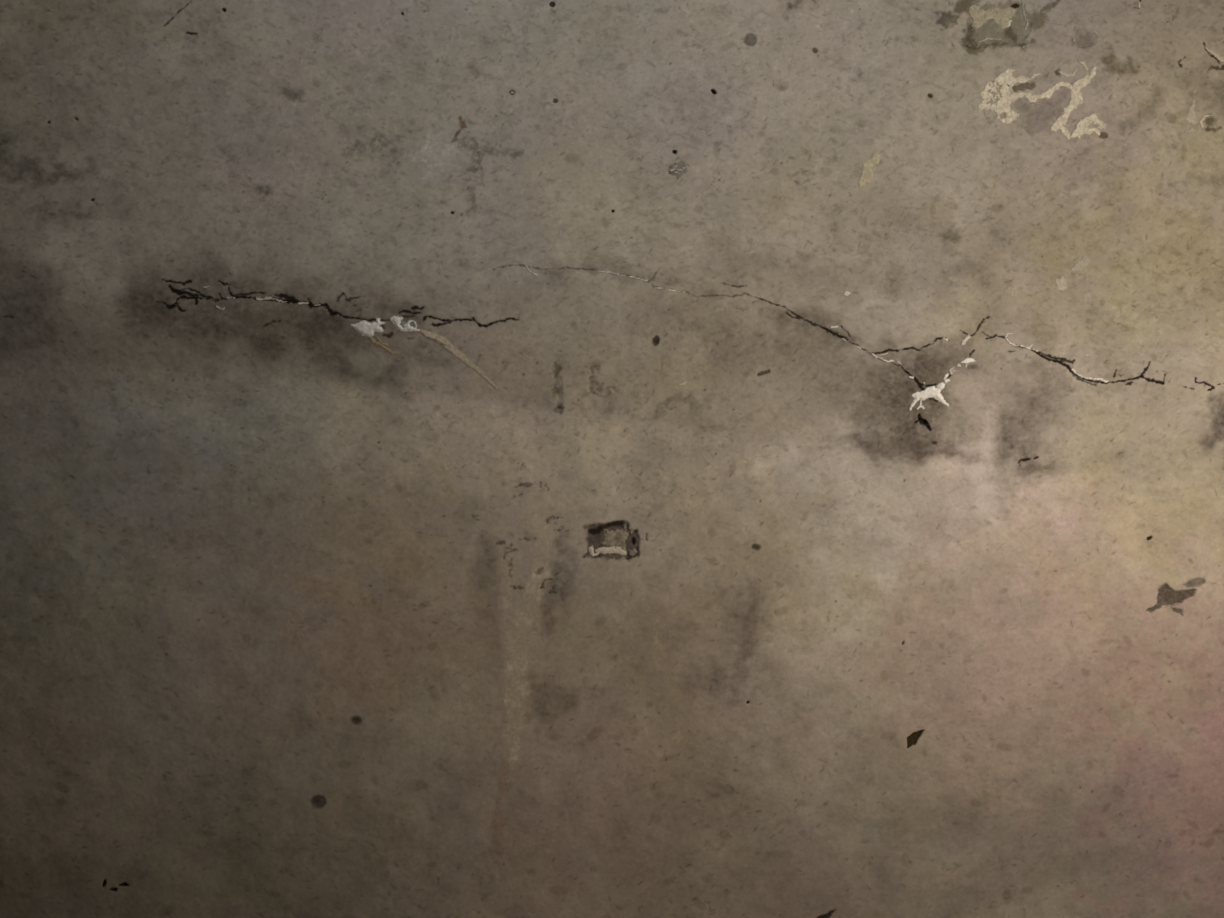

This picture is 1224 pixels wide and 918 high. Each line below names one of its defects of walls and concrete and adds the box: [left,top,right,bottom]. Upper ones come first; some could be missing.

spalling [937,0,1063,54]
peeling [978,31,1108,139]
crack [157,279,519,339]
damp [351,316,498,389]
damp [910,335,975,411]
crack [724,283,1220,391]
spalling [585,521,639,560]
spalling [1148,582,1195,615]